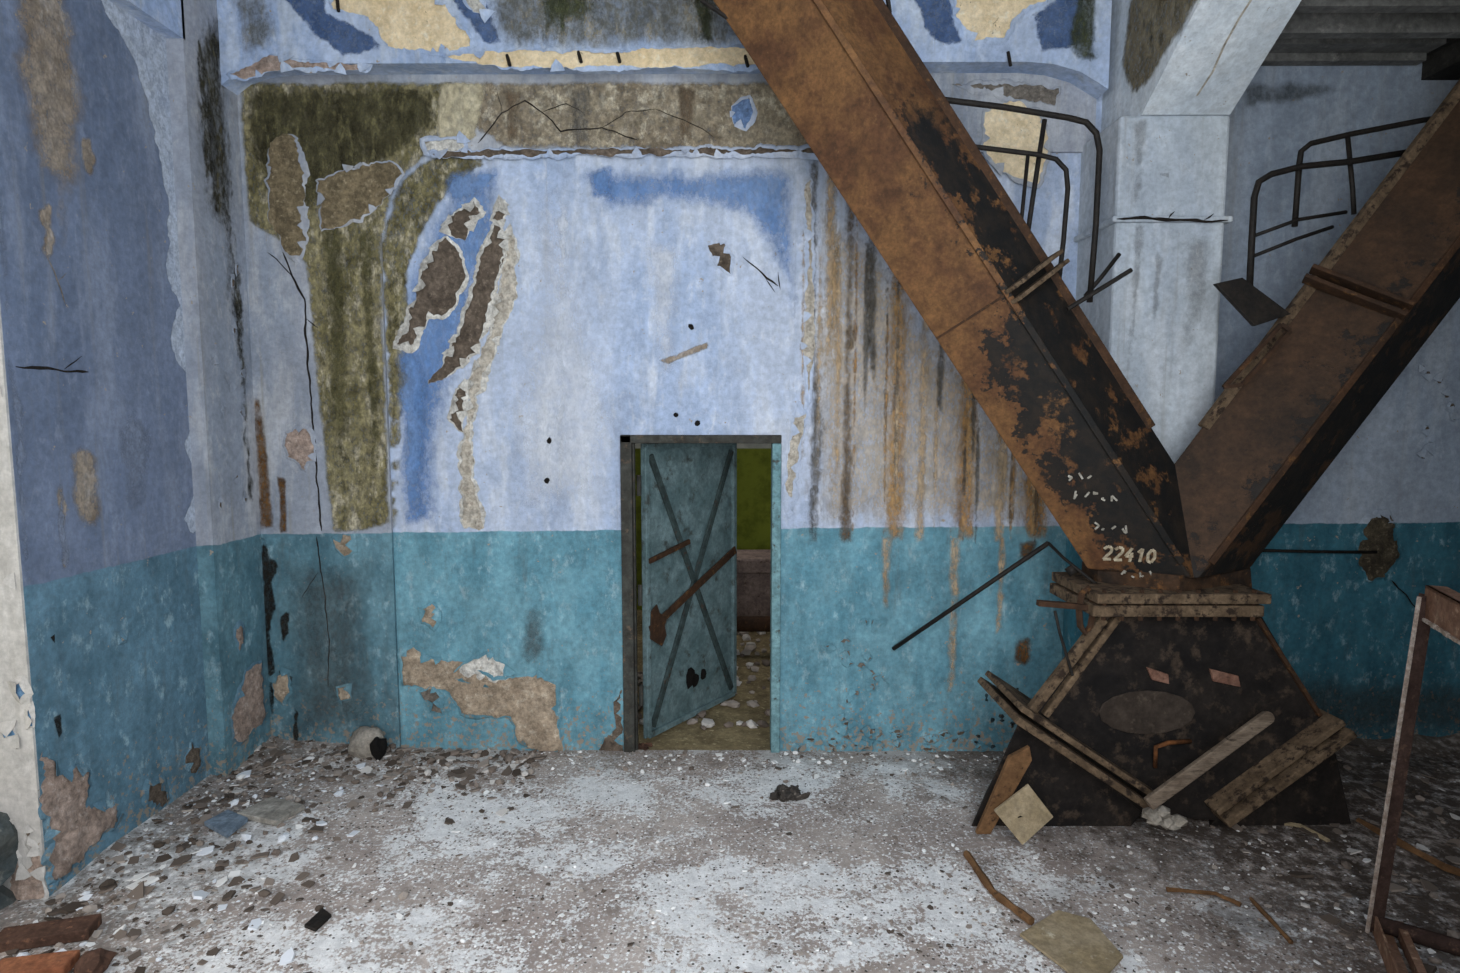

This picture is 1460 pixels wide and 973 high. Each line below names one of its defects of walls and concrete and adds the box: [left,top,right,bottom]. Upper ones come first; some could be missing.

peeling [226,0,758,81]
peeling [915,0,1079,188]
damp [198,27,808,531]
spalling [393,95,818,530]
corrosion [801,163,1046,686]
spalling [417,601,442,631]
spalling [10,753,125,901]
spalling [140,775,171,811]
spalling [183,738,206,776]
spalling [230,620,293,746]
spalling [397,643,565,752]